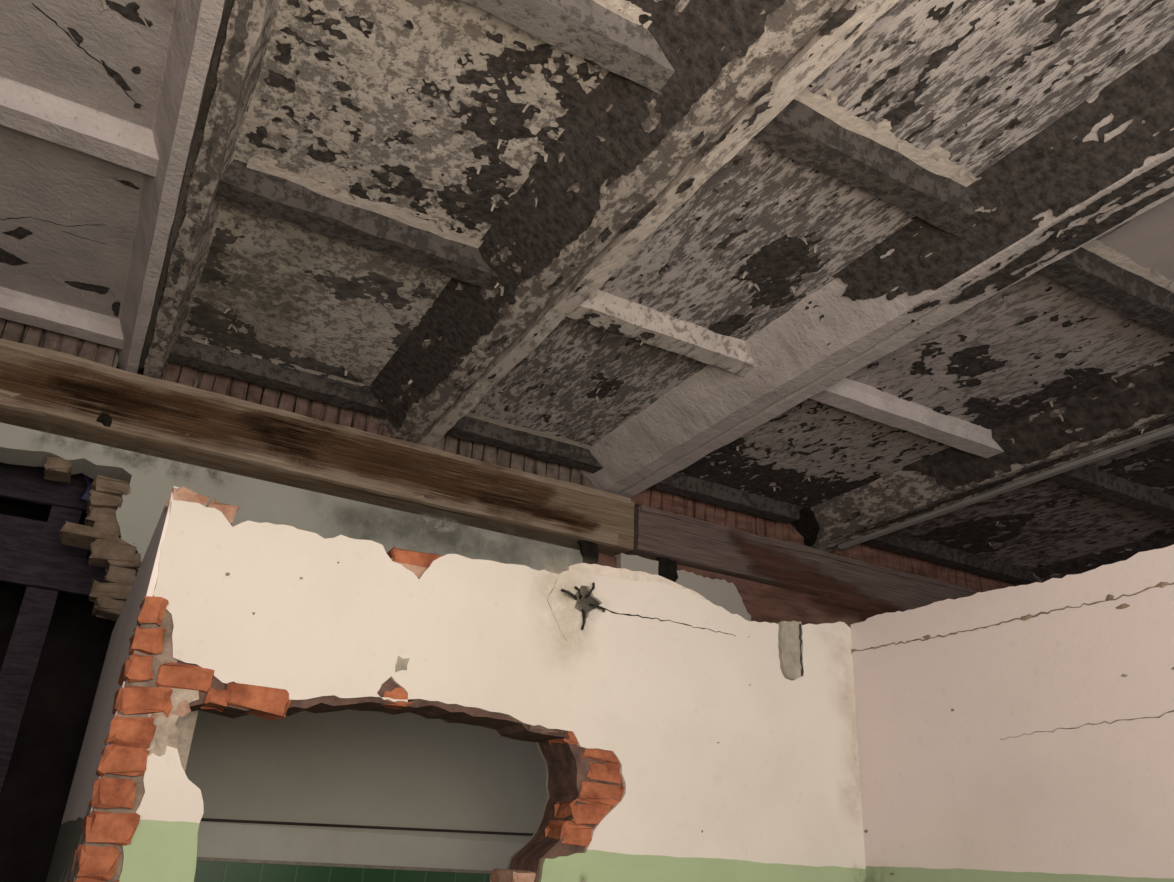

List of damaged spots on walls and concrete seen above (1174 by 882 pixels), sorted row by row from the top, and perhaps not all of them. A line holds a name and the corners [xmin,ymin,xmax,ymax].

crack [31,3,141,110]
peeling [184,0,786,429]
peeling [678,0,1174,582]
peeling [465,367,612,450]
spalling [561,582,605,630]
crack [603,607,735,636]
crack [851,582,1174,653]
flaking render [382,682,412,710]
flaking render [395,656,410,672]
crack [1003,710,1174,740]
flaking render [527,725,625,846]
flaking render [490,868,536,882]